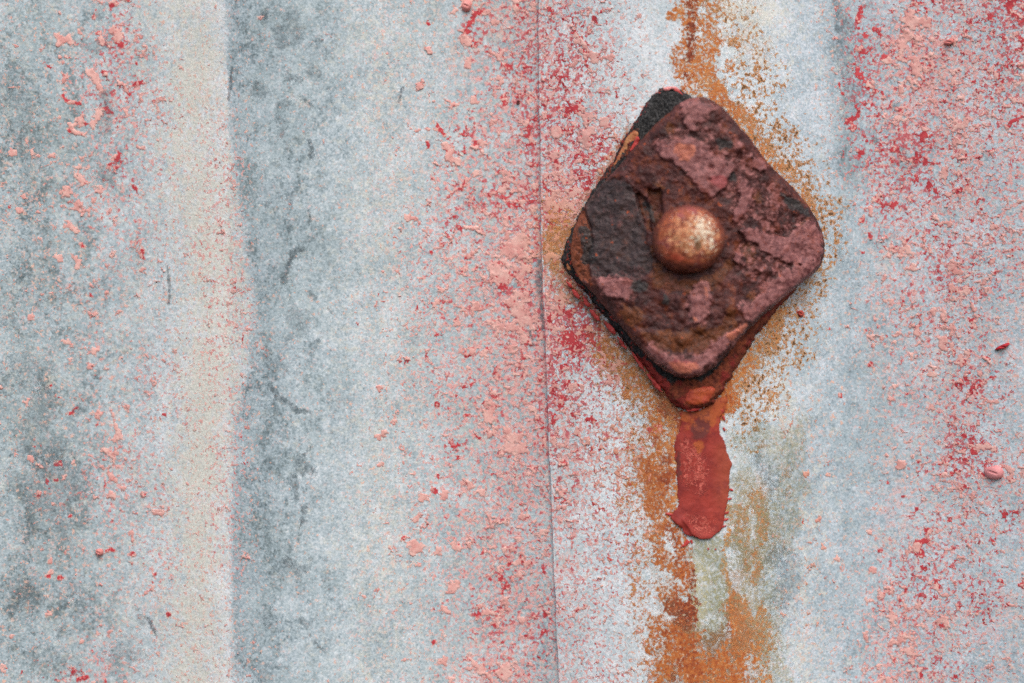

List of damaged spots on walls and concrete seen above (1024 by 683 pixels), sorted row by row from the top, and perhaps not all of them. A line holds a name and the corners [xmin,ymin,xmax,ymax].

peeling [0,0,194,397]
peeling [10,394,200,635]
peeling [191,141,248,263]
peeling [195,264,271,385]
peeling [354,0,668,683]
rust [541,0,857,683]
peeling [773,0,1024,683]